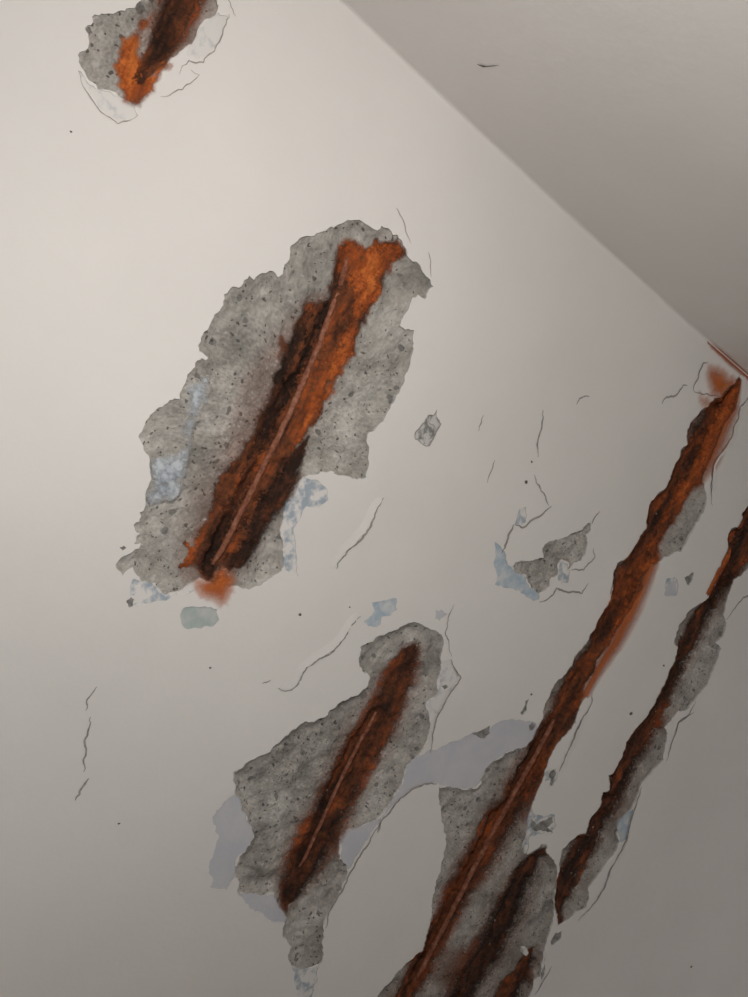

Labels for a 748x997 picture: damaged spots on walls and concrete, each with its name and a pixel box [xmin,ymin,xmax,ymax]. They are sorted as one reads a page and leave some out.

spalling [78,0,227,123]
spalling [116,220,432,607]
crack [502,413,552,553]
peeling [180,606,218,629]
corrosion [199,570,232,600]
crack [541,548,595,602]
spalling [209,379,748,997]